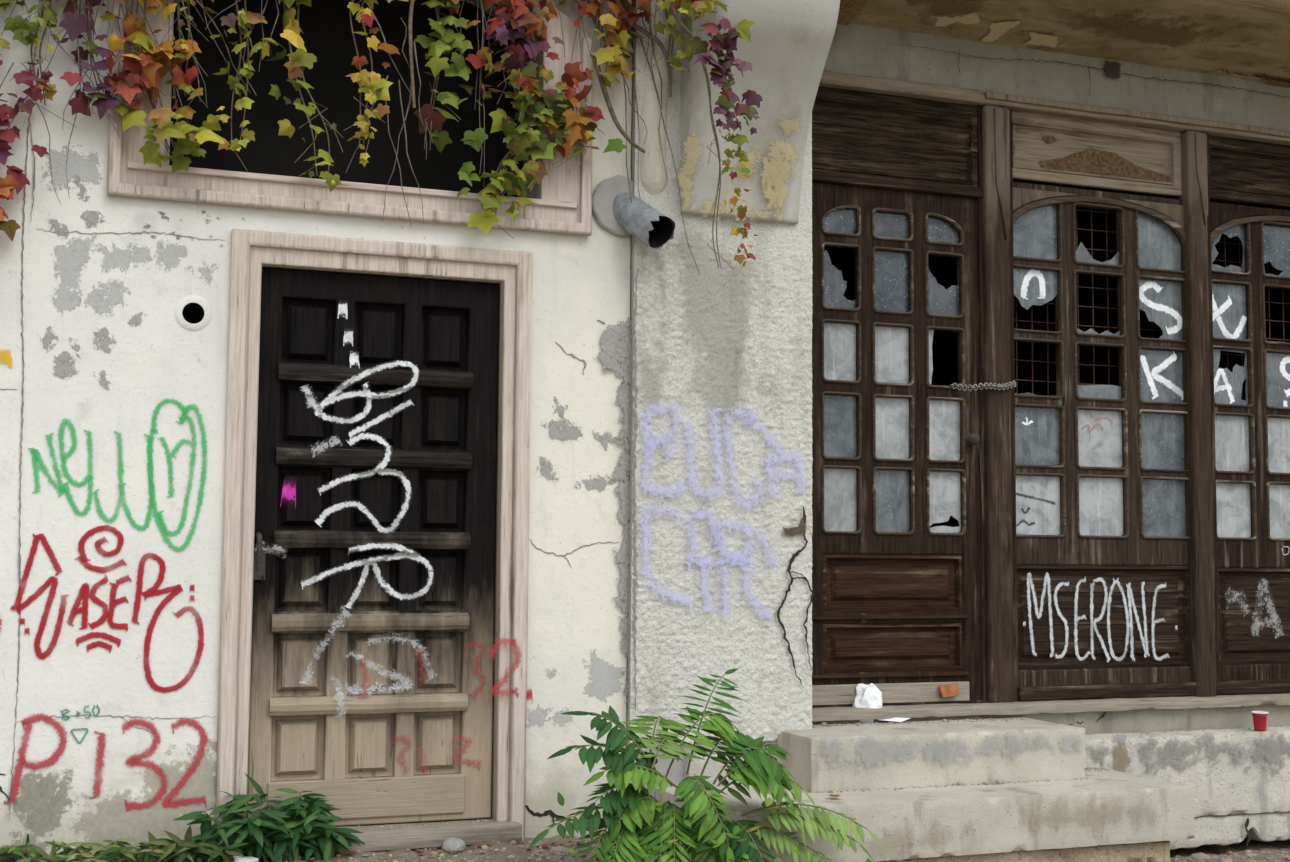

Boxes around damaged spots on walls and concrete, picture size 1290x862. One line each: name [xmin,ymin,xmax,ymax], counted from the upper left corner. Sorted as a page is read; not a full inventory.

peeling [935,13,1059,47]
peeling [678,112,803,224]
peeling [40,145,223,380]
crack [0,0,221,821]
flaking render [538,317,632,704]
crack [777,506,814,685]
peeling [527,704,573,727]